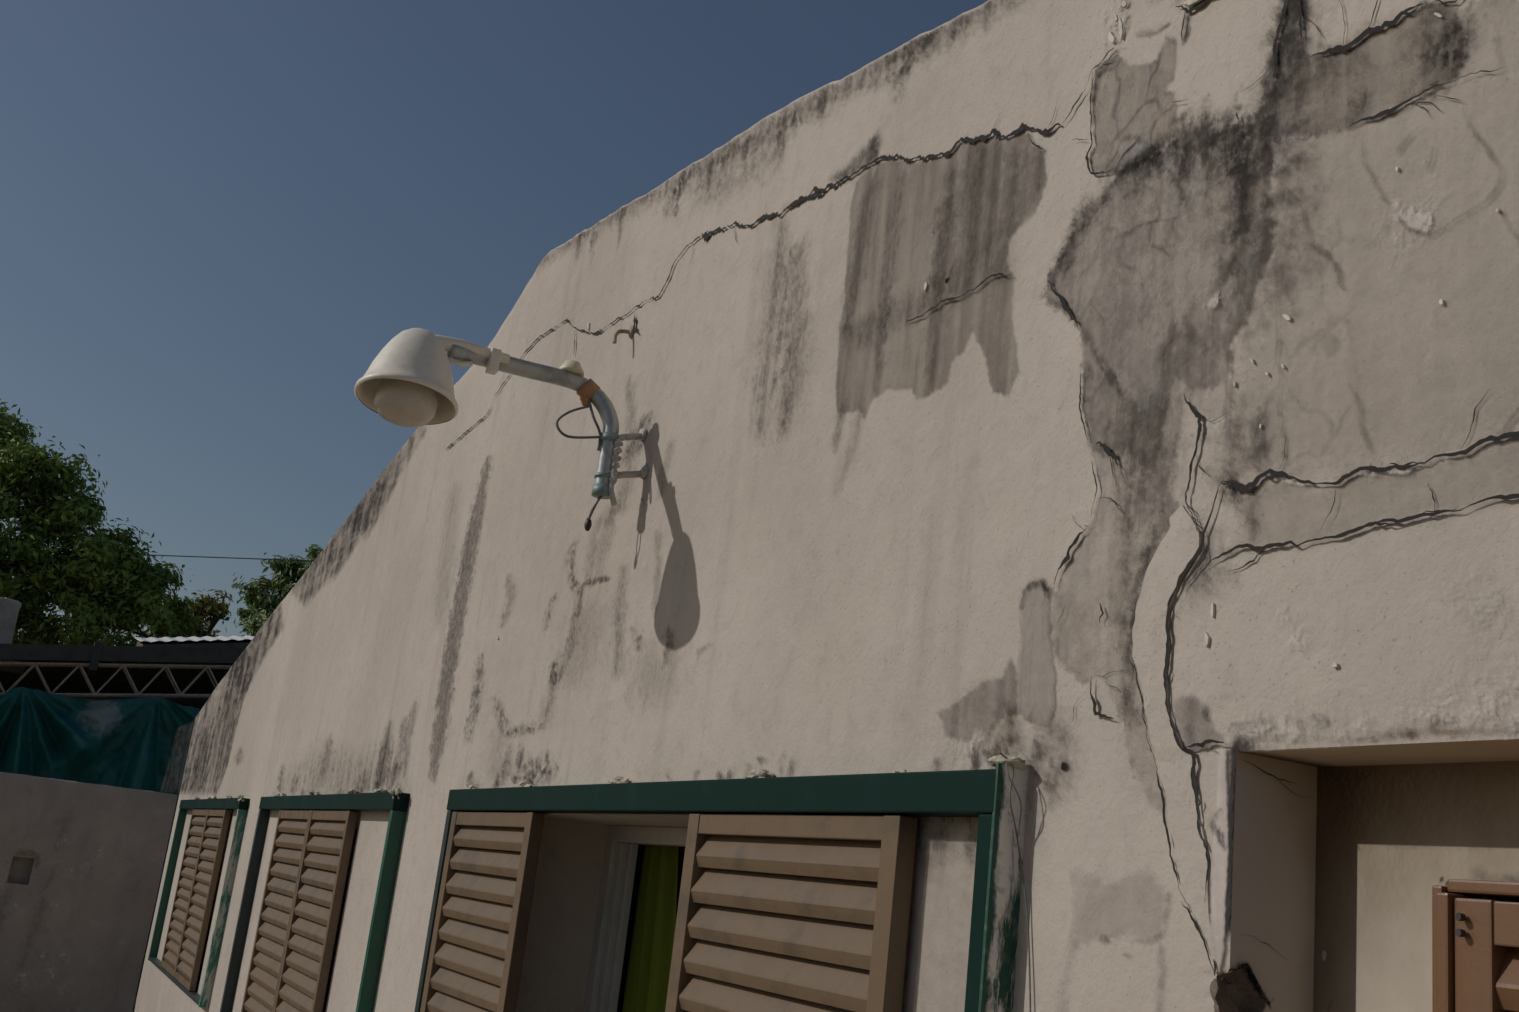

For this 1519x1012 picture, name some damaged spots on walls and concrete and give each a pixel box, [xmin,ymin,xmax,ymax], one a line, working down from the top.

crack [446,48,1141,449]
water stain [924,138,1006,317]
crack [1176,0,1207,40]
water stain [1234,0,1306,233]
crack [1236,0,1457,119]
crack [1348,67,1502,127]
water stain [161,609,280,792]
water stain [296,436,413,599]
water stain [430,457,488,777]
crack [1042,281,1126,623]
crack [1072,391,1519,984]
flaking render [1210,747,1270,1012]